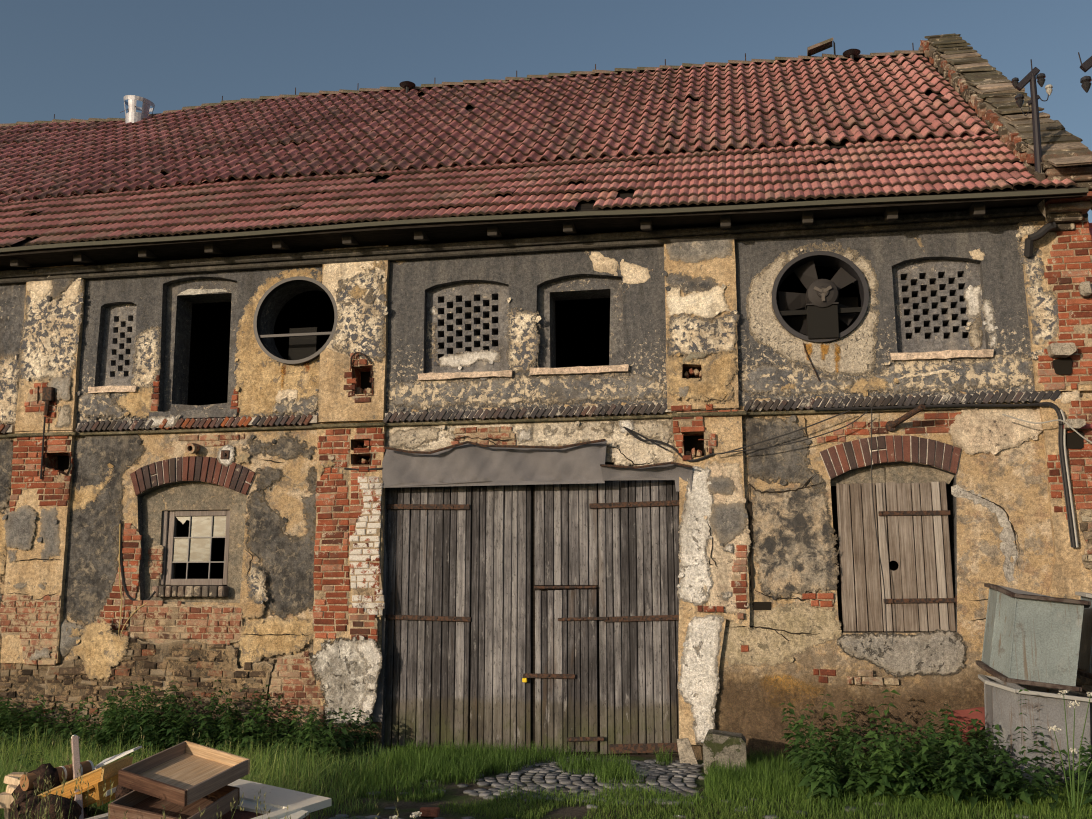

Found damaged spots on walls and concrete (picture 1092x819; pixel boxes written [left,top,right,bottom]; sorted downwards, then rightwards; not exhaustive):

rust [805,344,840,372]
flaking render [0,217,1092,745]
crack [707,521,716,565]
crack [726,473,832,641]
crack [951,484,1020,583]